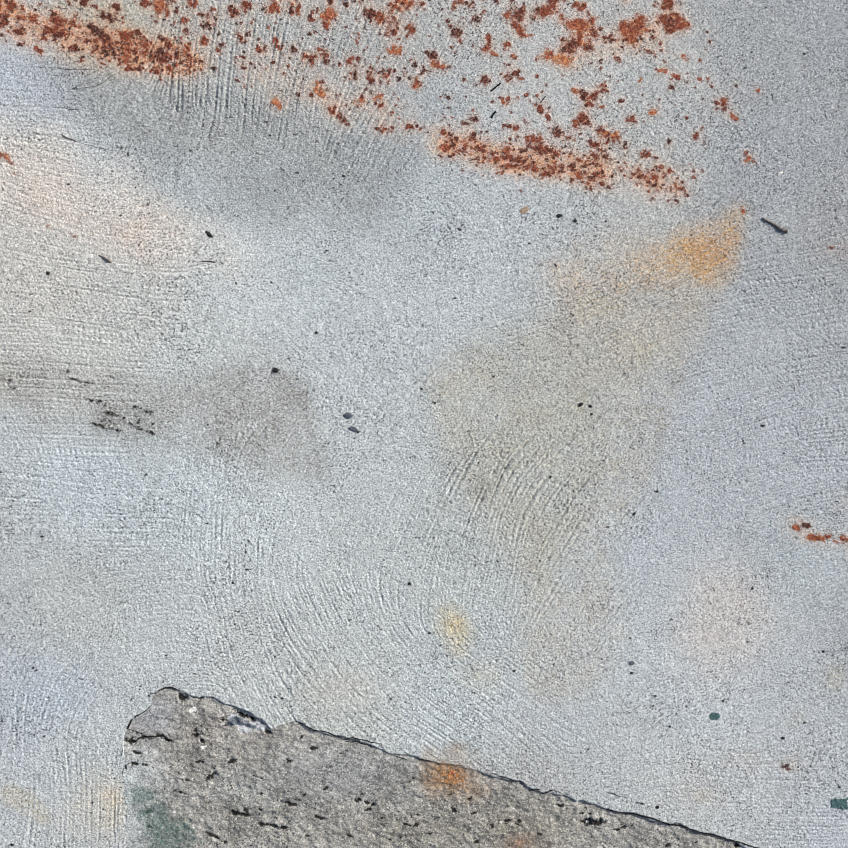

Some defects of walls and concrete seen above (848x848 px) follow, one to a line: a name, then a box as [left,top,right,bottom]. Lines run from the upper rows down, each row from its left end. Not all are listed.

rust [0,0,768,396]
rust [770,487,848,563]
spalling [123,688,744,848]